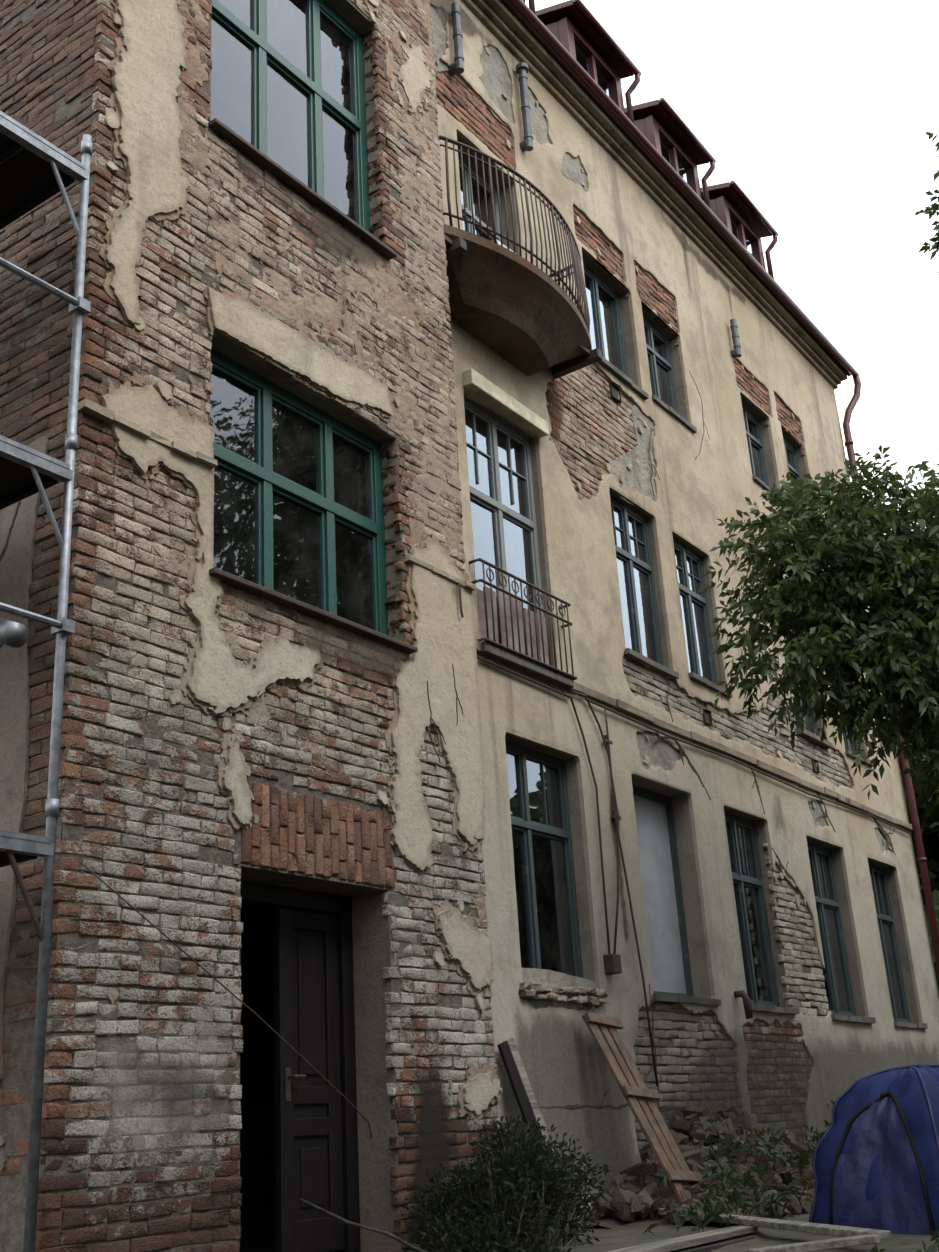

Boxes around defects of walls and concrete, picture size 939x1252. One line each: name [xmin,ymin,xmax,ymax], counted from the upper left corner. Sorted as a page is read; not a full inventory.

peeling [354,0,381,24]
peeling [98,0,191,336]
peeling [202,286,400,418]
spalling [545,364,657,506]
peeling [99,371,324,830]
peeling [376,533,486,872]
spalling [622,655,852,789]
peeling [431,899,494,1010]
spalling [521,968,598,1011]
spalling [633,843,829,1143]
peeling [448,1063,503,1123]